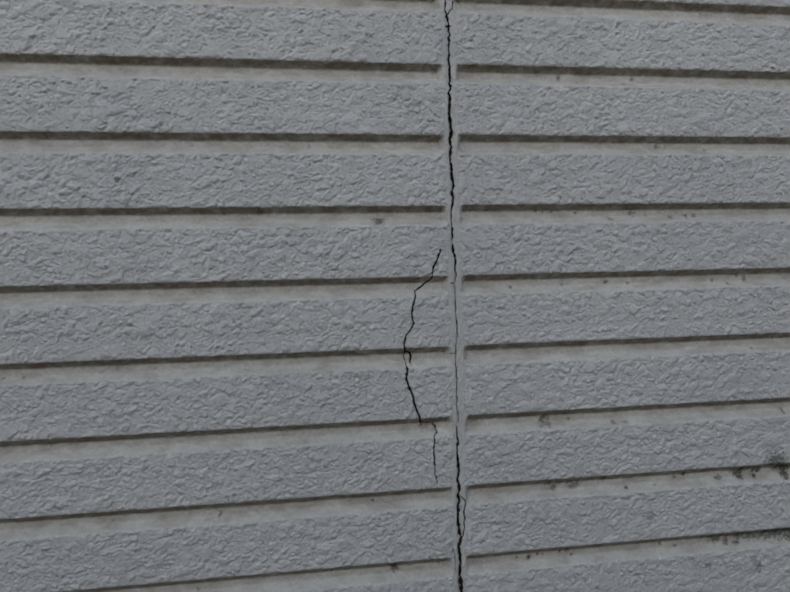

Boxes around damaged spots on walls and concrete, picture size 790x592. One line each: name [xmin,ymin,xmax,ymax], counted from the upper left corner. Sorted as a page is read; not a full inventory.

crack [403,0,467,592]